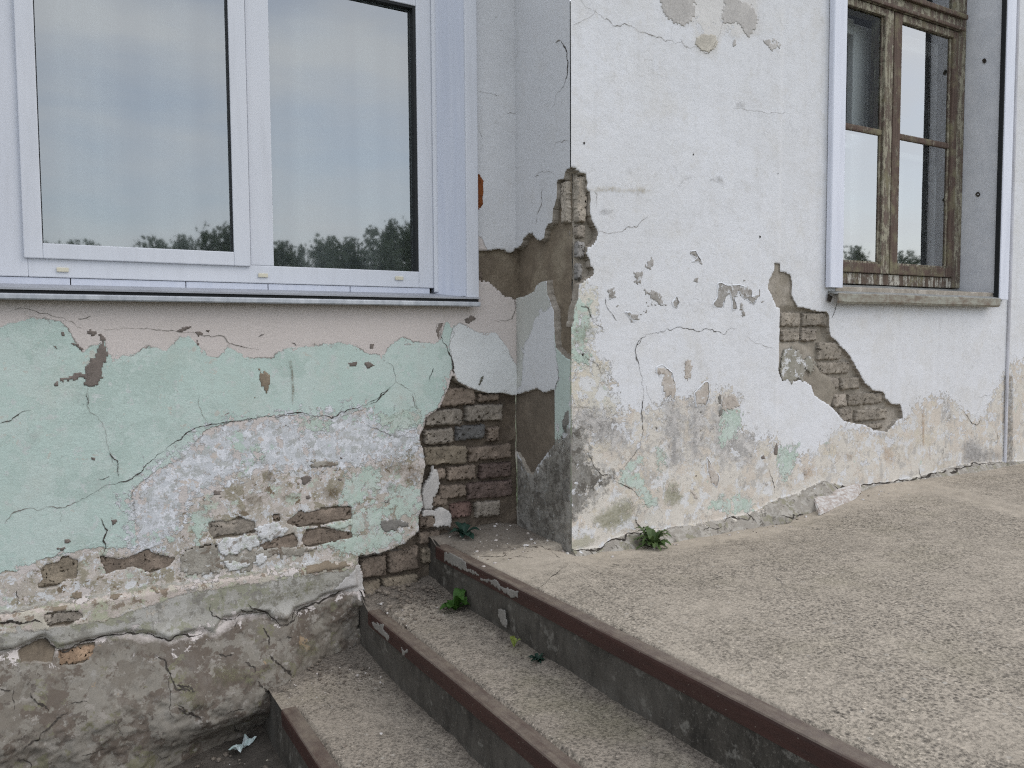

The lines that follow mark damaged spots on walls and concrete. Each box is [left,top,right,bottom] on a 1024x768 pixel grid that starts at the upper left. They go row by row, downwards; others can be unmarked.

crack [552,0,724,107]
peeling [54,329,108,387]
crack [6,323,454,521]
spalling [100,376,570,598]
spalling [479,173,593,355]
crack [481,327,721,588]
peeling [607,257,680,323]
spalling [712,264,900,431]
crack [826,449,1000,488]
spalling [38,539,83,626]
crack [0,589,346,719]
crack [1,689,87,767]